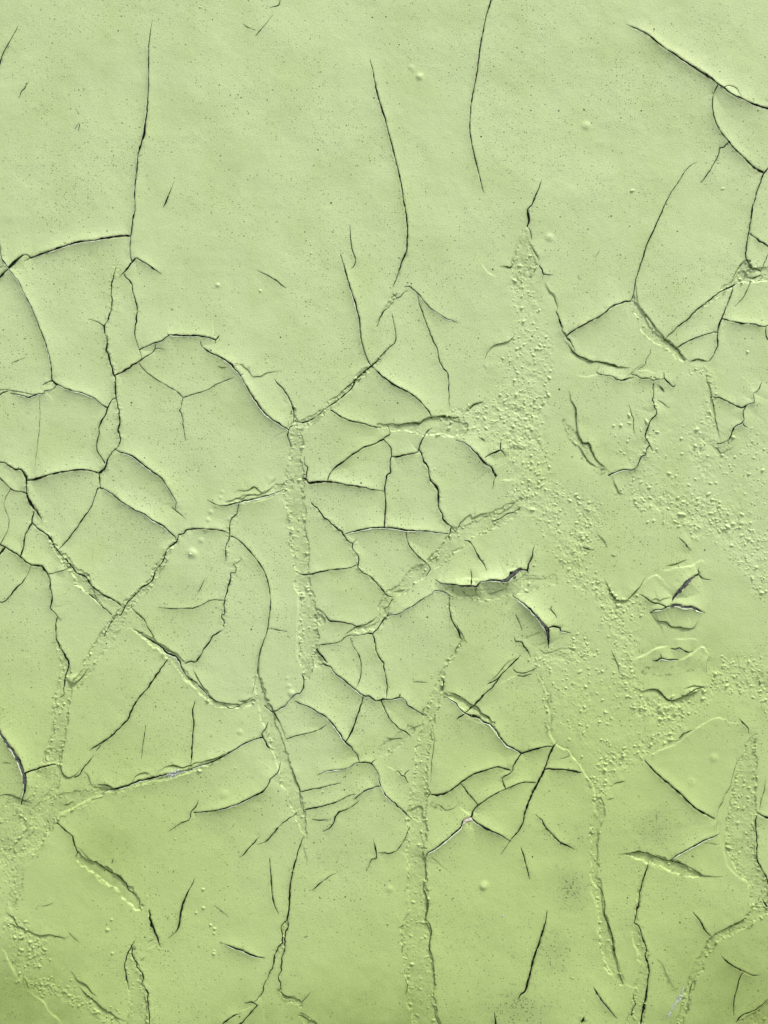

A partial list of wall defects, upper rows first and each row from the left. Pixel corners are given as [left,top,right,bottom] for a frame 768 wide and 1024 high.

crack [556,26,768,476]
crack [0,0,581,1024]
peeling [345,227,768,1024]
crack [633,538,709,614]
crack [654,647,693,661]
crack [581,761,717,1024]
crack [724,959,766,1022]
crack [755,813,768,907]